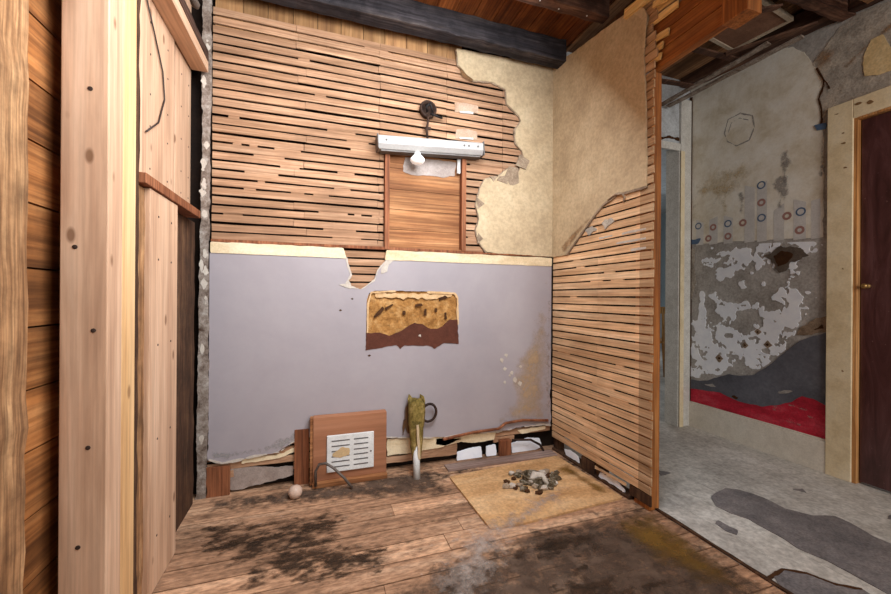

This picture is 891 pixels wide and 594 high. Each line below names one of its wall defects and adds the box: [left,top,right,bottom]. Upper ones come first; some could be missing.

spalling [812,0,891,117]
spalling [455,50,530,253]
spalling [340,257,394,289]
peeling [691,238,826,439]
peeling [386,438,411,456]
peeling [422,433,496,461]
peeling [511,425,545,453]